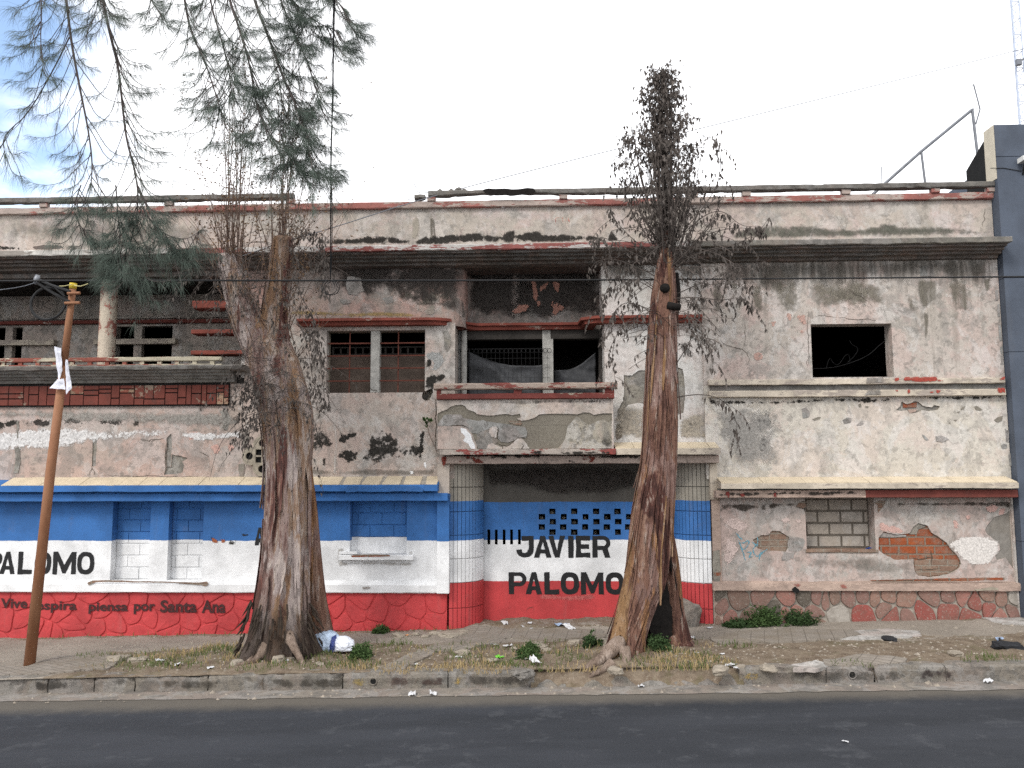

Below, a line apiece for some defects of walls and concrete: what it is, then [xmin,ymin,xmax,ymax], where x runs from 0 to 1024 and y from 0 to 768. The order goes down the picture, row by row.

leakage [318,219,617,244]
leakage [515,274,599,317]
leakage [728,259,989,336]
leakage [0,411,241,450]
spalling [437,370,645,449]
spalling [677,368,685,414]
spalling [859,376,943,413]
peeling [712,518,747,582]
spalling [753,501,806,561]
spalling [870,501,1012,591]